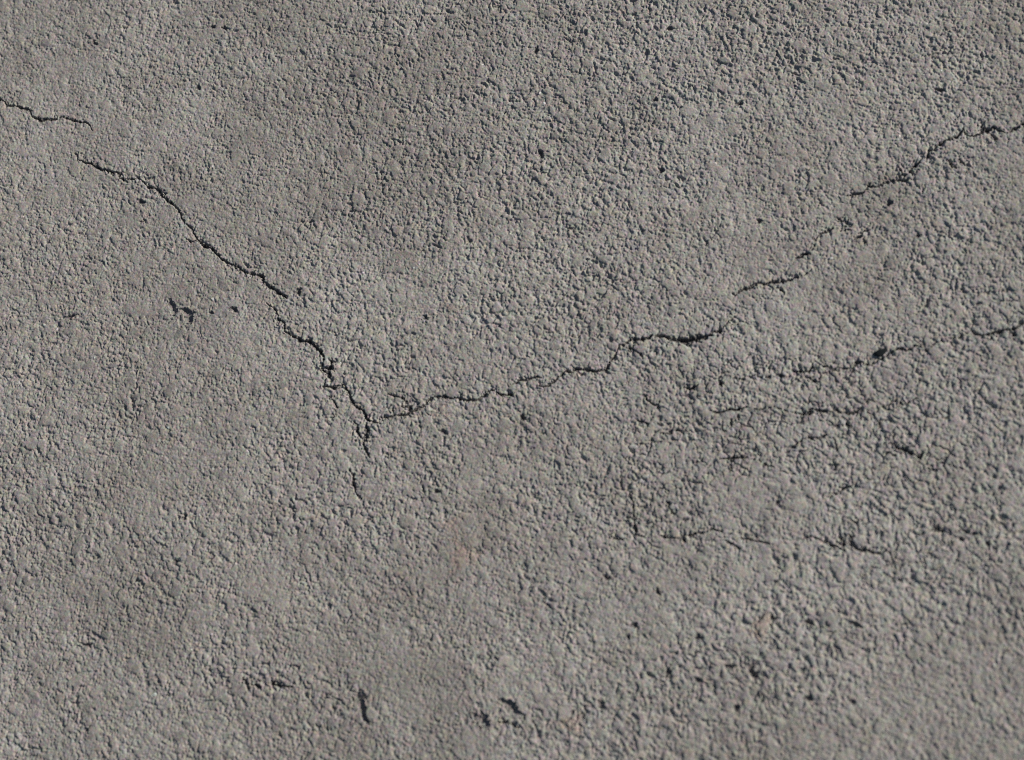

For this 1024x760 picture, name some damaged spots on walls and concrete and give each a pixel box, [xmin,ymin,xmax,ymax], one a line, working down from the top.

crack [0,99,92,131]
crack [75,121,1024,499]